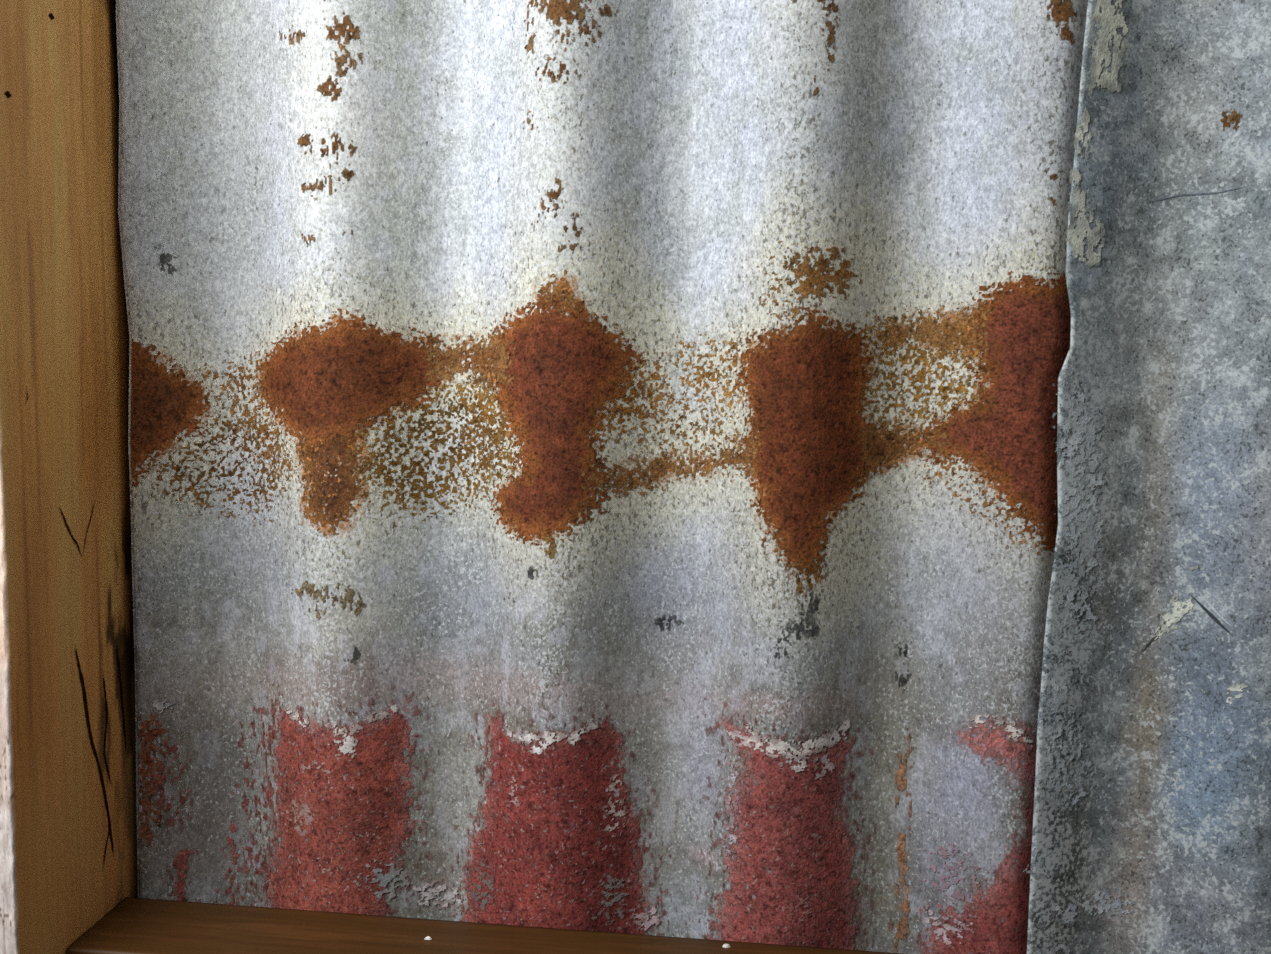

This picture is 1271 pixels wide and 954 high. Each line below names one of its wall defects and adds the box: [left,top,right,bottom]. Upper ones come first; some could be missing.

corrosion [130,0,1128,811]
peeling [141,701,193,830]
peeling [167,849,199,902]
peeling [216,686,671,936]
peeling [687,703,881,951]
peeling [917,714,1036,954]
corrosion [1042,887,1136,954]